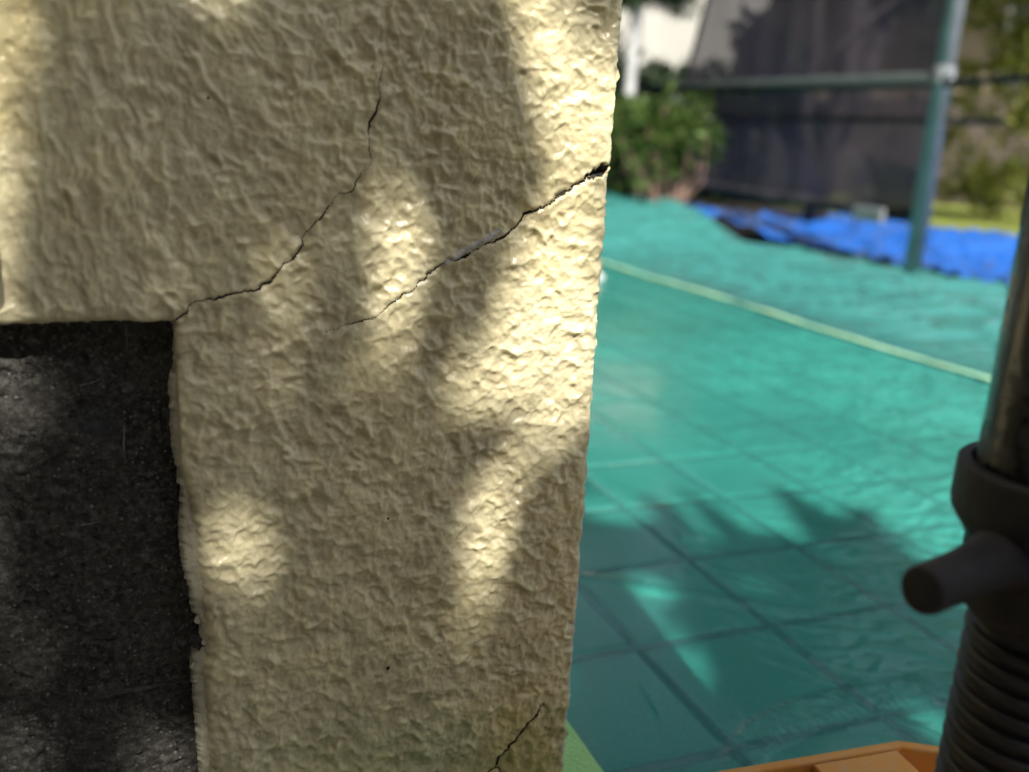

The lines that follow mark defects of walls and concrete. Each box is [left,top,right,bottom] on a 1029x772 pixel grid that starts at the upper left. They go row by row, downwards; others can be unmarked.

crack [174,66,383,323]
crack [327,175,591,332]
crack [488,705,541,772]